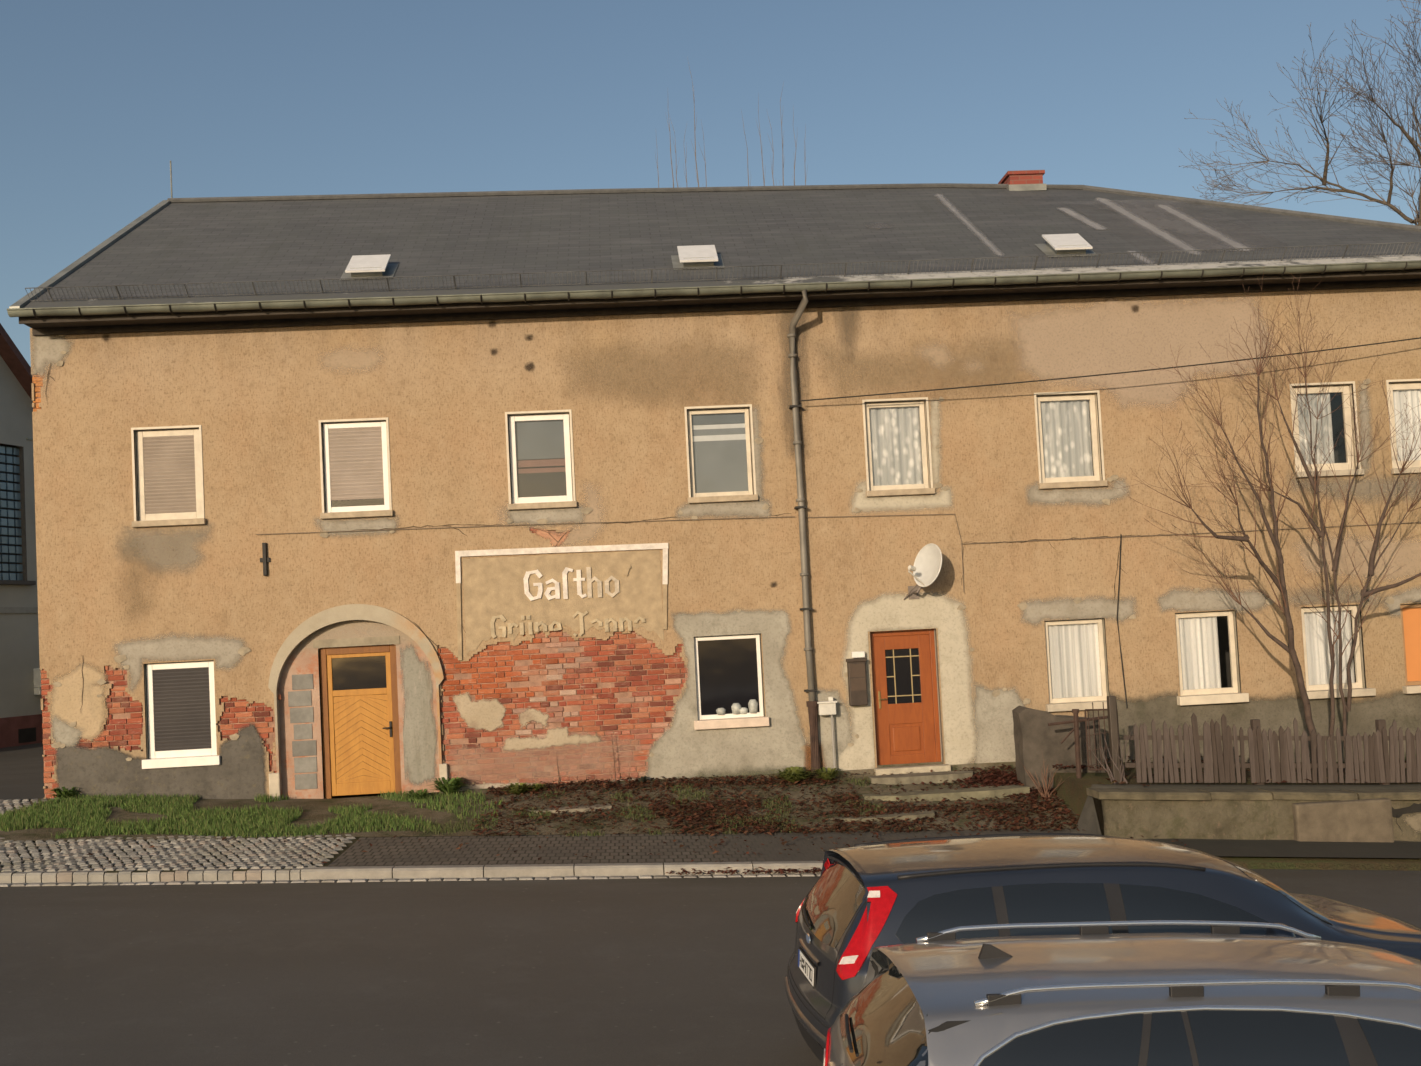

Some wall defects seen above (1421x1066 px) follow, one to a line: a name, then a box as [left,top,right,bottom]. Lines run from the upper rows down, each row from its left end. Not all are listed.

flaking render [41,663,145,798]
flaking render [217,683,281,773]
flaking render [430,628,688,786]
crack [1392,803,1421,831]